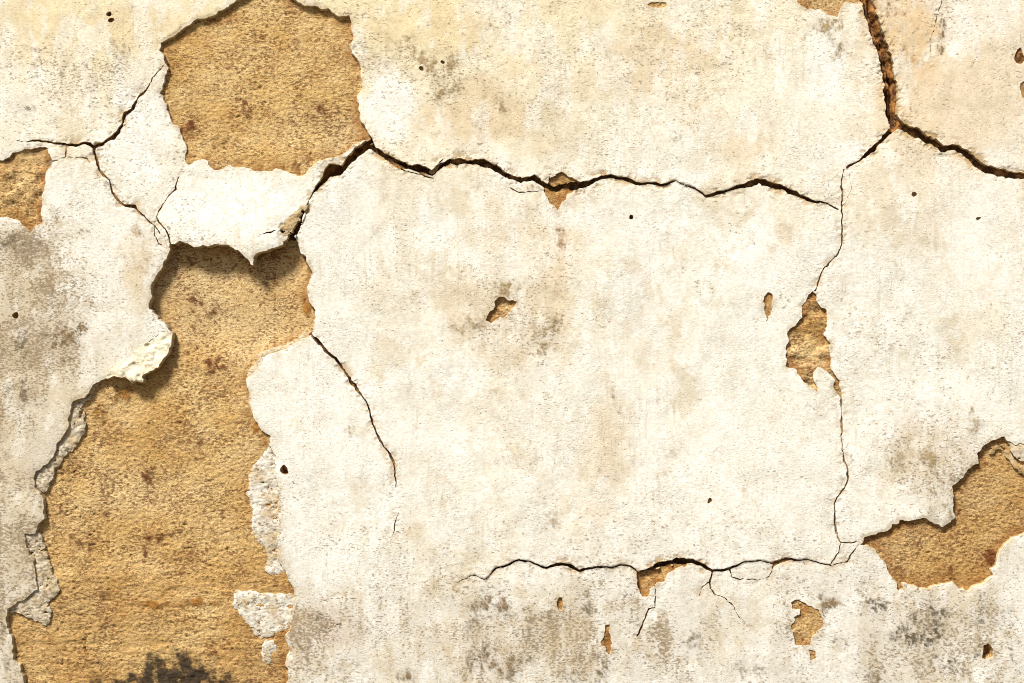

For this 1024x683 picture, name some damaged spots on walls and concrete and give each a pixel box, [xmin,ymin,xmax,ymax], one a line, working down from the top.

flaking render [0,147,52,231]
crack [17,59,179,249]
flaking render [161,0,371,176]
crack [267,0,1024,293]
flaking render [9,240,315,683]
crack [309,332,397,484]
flaking render [486,297,516,323]
crack [470,389,856,618]
flaking render [785,292,841,399]
flaking render [862,437,1024,590]
crack [636,596,656,636]
flaking render [791,600,823,660]